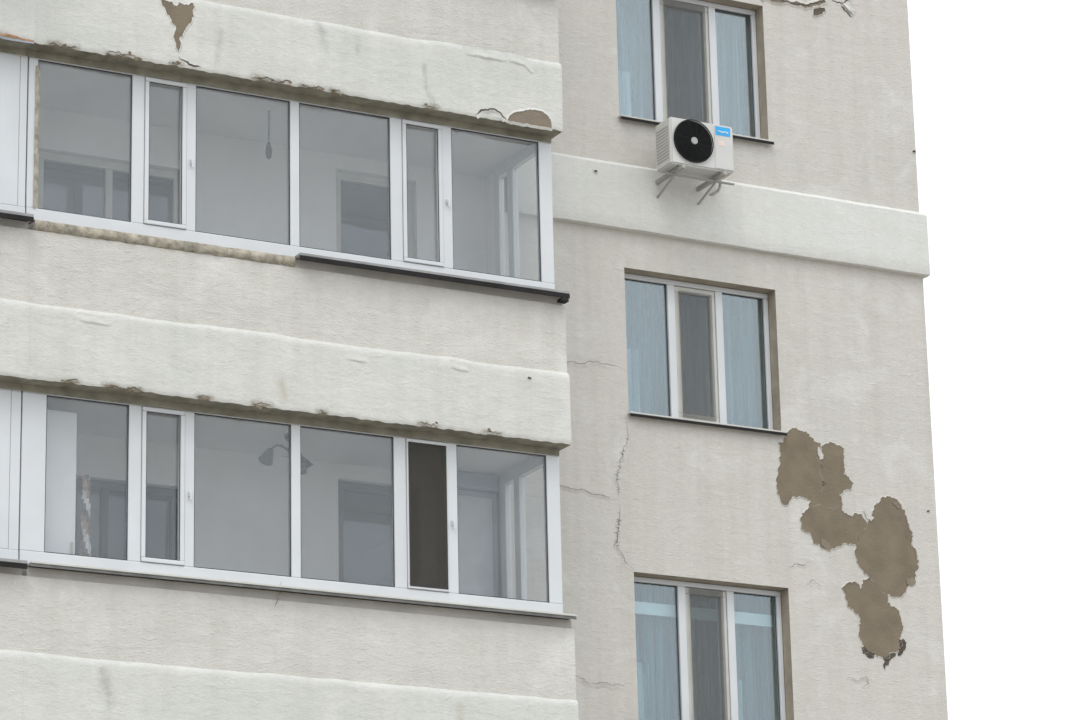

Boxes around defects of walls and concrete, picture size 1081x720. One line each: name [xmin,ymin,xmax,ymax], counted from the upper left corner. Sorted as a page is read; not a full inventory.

flaking render [159,0,200,67]
crack [761,0,856,18]
flaking render [476,108,554,131]
crack [567,361,623,371]
crack [538,418,634,572]
flaking render [775,427,920,669]